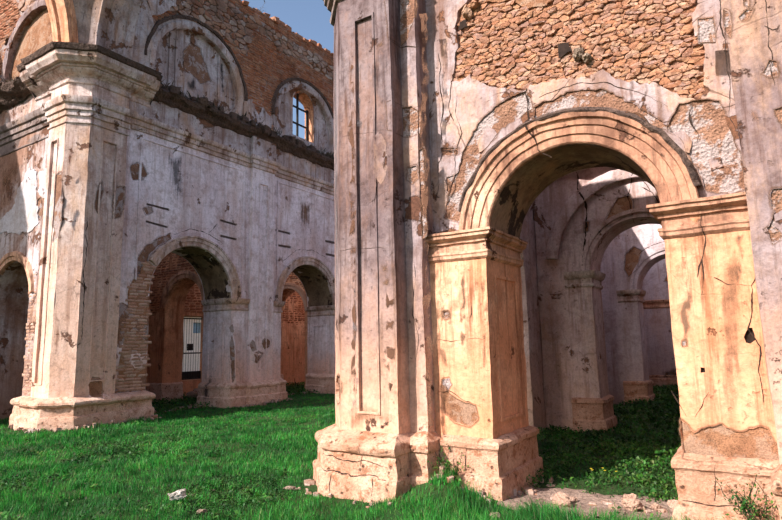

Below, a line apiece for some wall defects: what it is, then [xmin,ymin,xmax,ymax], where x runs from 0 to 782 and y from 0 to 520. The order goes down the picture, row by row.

spalling [183,43,211,84]
crack [765,0,778,85]
leakage [348,112,362,235]
crack [435,55,462,200]
spalling [441,88,745,226]
spalling [767,187,782,245]
flaking render [115,233,174,392]
leakage [351,246,362,375]
crack [697,216,764,403]
spalling [87,374,106,400]
spalling [441,377,479,427]